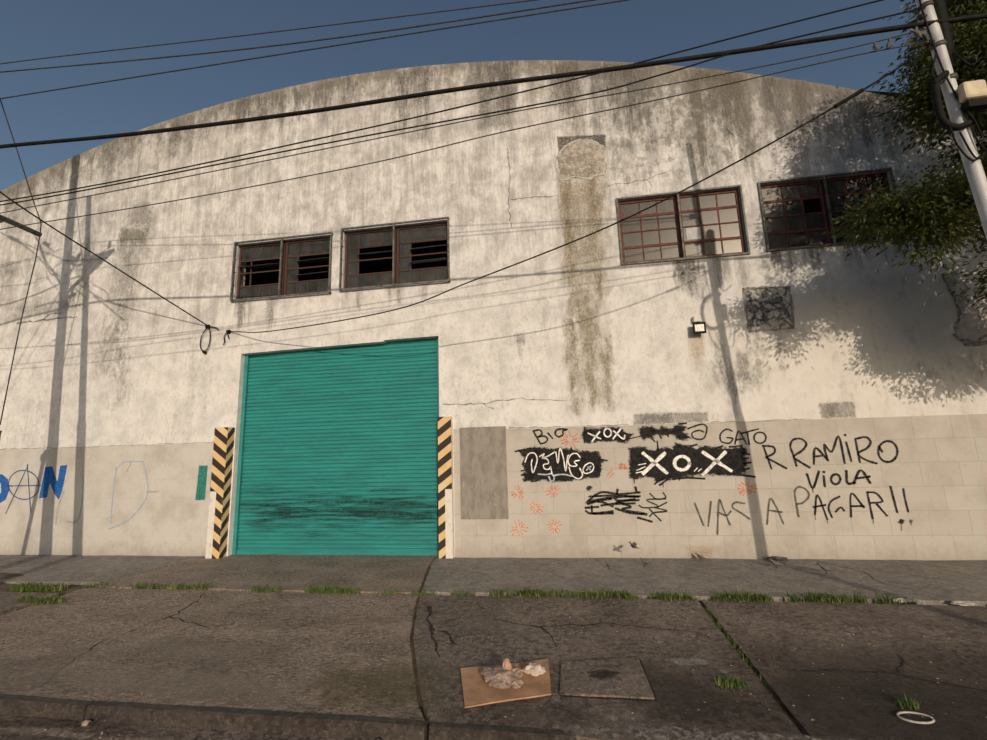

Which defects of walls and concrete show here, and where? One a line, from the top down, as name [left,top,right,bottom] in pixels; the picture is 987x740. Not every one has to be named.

flaking render [555,135,607,181]
water stain [562,177,602,299]